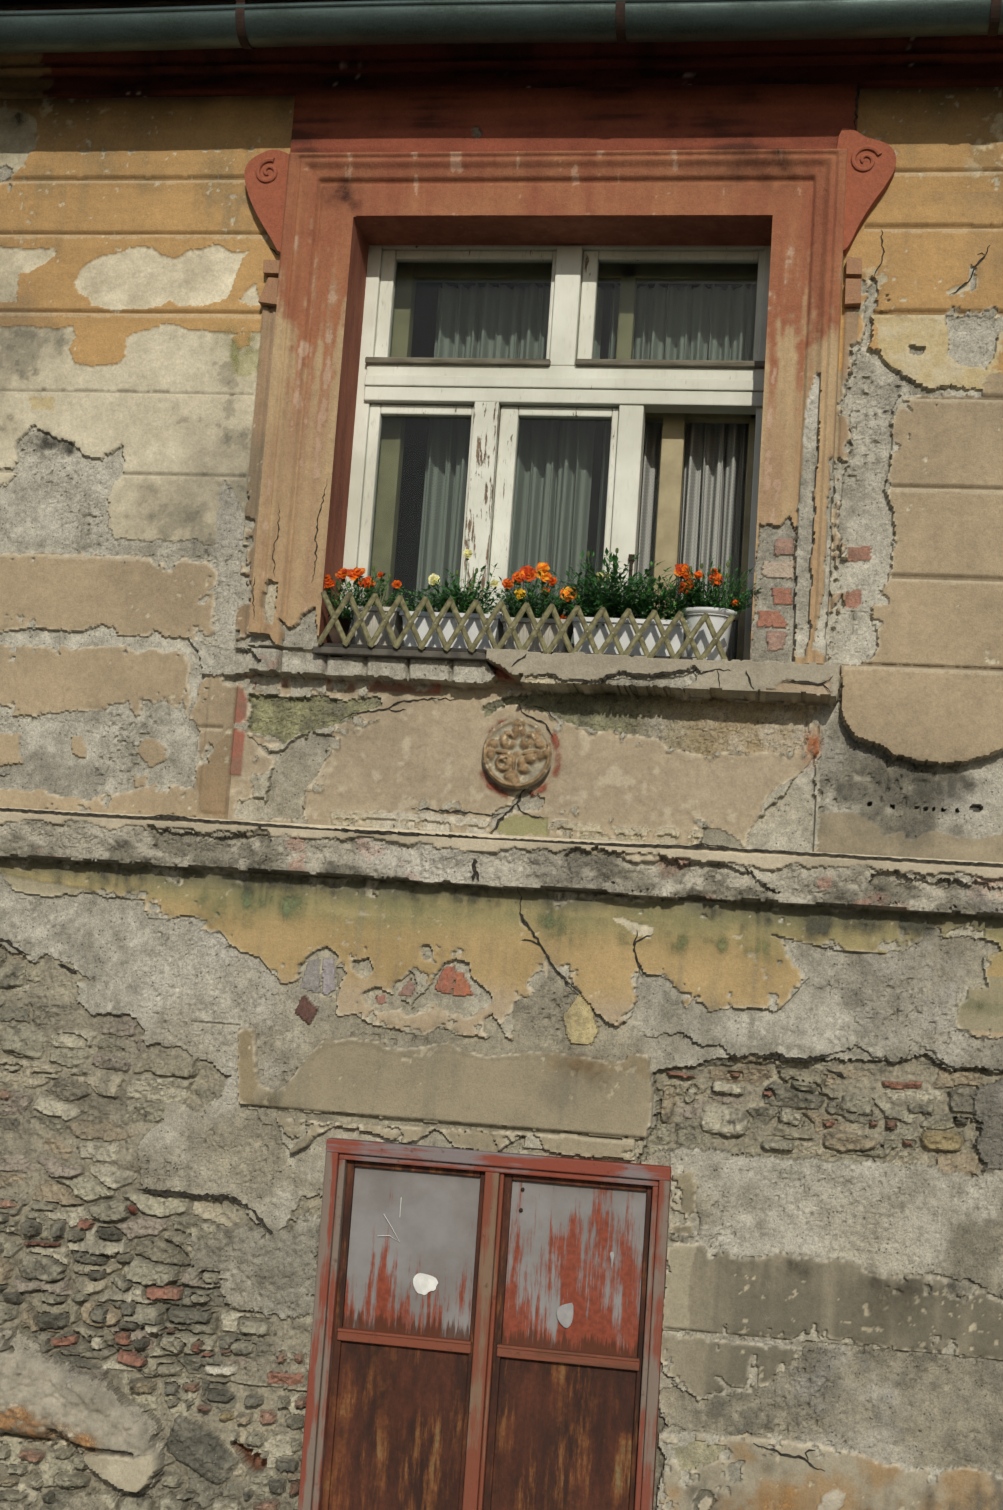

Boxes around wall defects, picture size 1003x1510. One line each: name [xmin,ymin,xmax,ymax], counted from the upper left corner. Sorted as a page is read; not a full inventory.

peeling [0,105,38,183]
crack [950,245,990,295]
peeling [0,242,319,800]
flaking render [330,275,1003,862]
crack [512,654,833,737]
flaking render [235,693,383,820]
flaking render [236,867,406,881]
crack [0,774,1003,882]
crack [0,938,77,974]
crack [517,887,581,995]
crack [633,931,653,975]
flaking render [0,880,1003,1510]